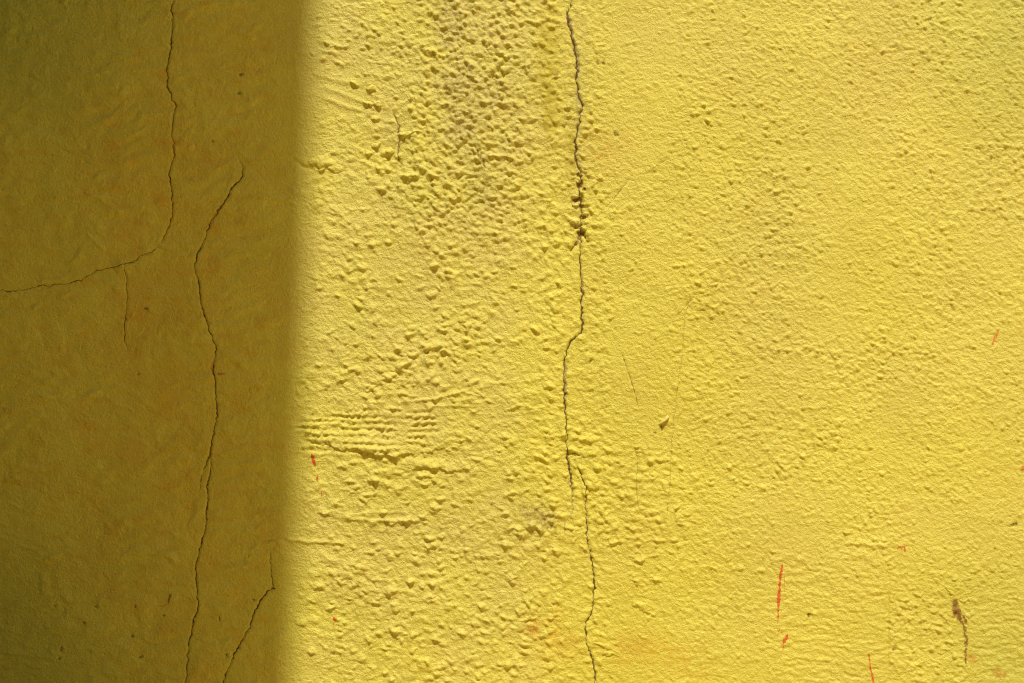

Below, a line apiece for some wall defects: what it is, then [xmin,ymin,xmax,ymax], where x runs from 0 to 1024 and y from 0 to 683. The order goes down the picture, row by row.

crack [2,3,177,349]
crack [185,170,243,683]
crack [223,557,275,683]
crack [562,4,596,683]